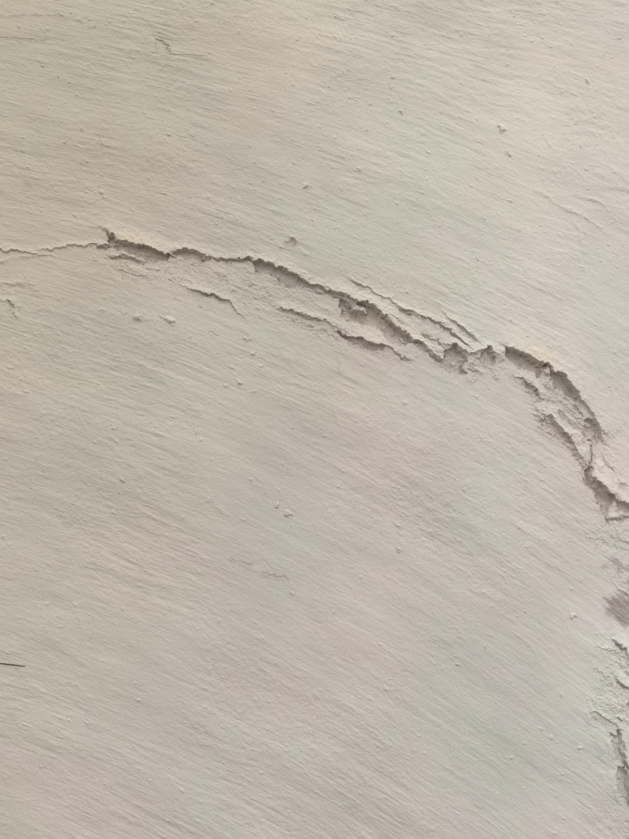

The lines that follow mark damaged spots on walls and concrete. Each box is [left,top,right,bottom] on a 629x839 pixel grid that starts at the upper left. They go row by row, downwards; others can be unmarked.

crack [0,11,98,42]
crack [0,215,629,550]
crack [585,623,629,839]